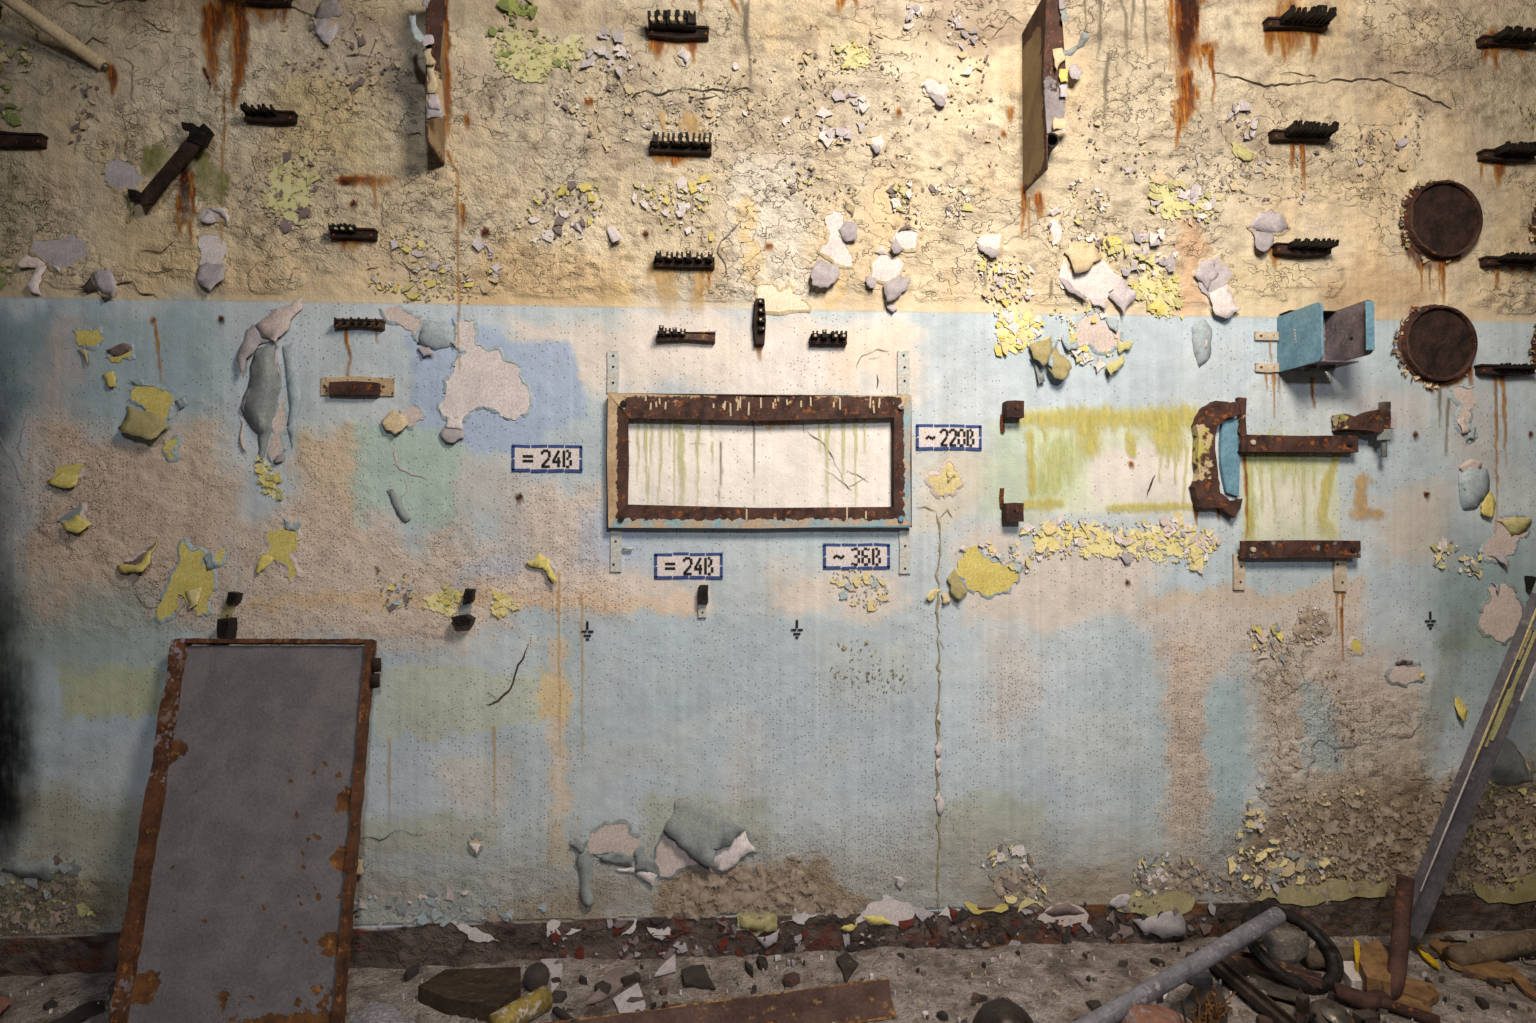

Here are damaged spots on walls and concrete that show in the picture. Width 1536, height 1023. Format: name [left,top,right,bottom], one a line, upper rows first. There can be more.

rust [201,0,288,167]
peeling [486,0,1002,316]
rust [1169,0,1216,147]
peeling [976,0,1426,388]
crack [1216,71,1456,109]
rust [1407,246,1458,293]
leakage [1018,404,1198,512]
rust [1494,376,1507,479]
peeling [926,511,1225,604]
crack [486,644,529,705]
crack [919,506,952,910]
spalling [353,603,1452,961]